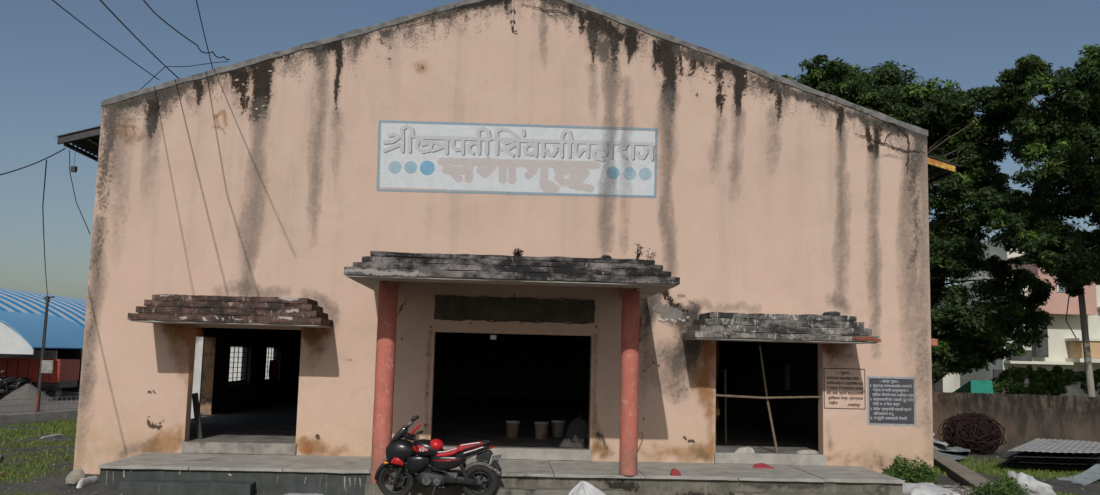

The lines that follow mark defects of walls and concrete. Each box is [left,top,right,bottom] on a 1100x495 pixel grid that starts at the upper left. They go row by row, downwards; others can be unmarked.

leakage [93,58,275,279]
leakage [307,0,511,115]
leakage [543,0,927,268]
leakage [667,307,701,376]